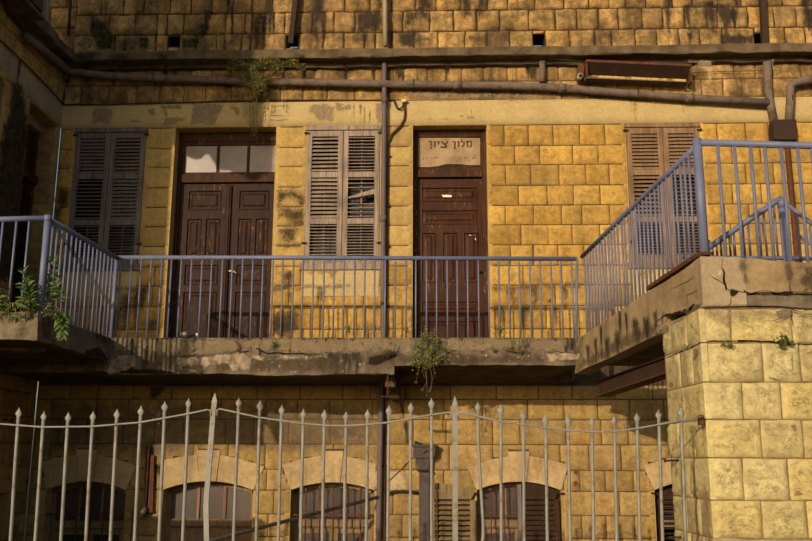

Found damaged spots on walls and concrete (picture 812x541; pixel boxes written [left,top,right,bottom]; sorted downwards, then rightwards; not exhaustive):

leakage [253,0,274,48]
leakage [312,0,326,47]
leakage [357,0,382,37]
leakage [400,0,432,46]
leakage [706,0,753,44]
leakage [802,0,812,30]
flaking render [309,103,351,121]
crack [657,261,812,325]
flaking render [85,337,412,374]
flaking render [440,337,580,362]